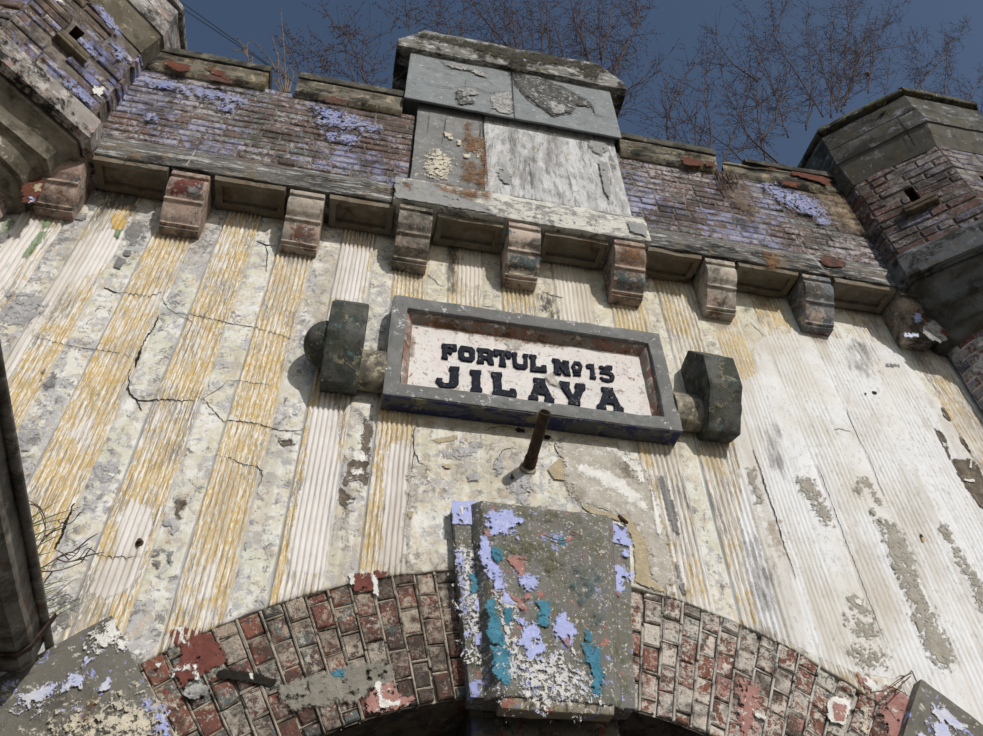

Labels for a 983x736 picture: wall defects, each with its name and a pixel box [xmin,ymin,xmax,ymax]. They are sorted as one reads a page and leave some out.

peeling [92,3,128,63]
peeling [63,79,105,110]
spalling [490,73,595,115]
peeling [417,132,487,182]
crack [35,287,304,431]
peeling [338,415,374,510]
spalling [935,428,983,508]
crack [54,503,75,549]
spalling [445,436,687,723]
peeling [1,613,277,736]
peeling [366,680,415,713]
peeling [918,703,969,736]